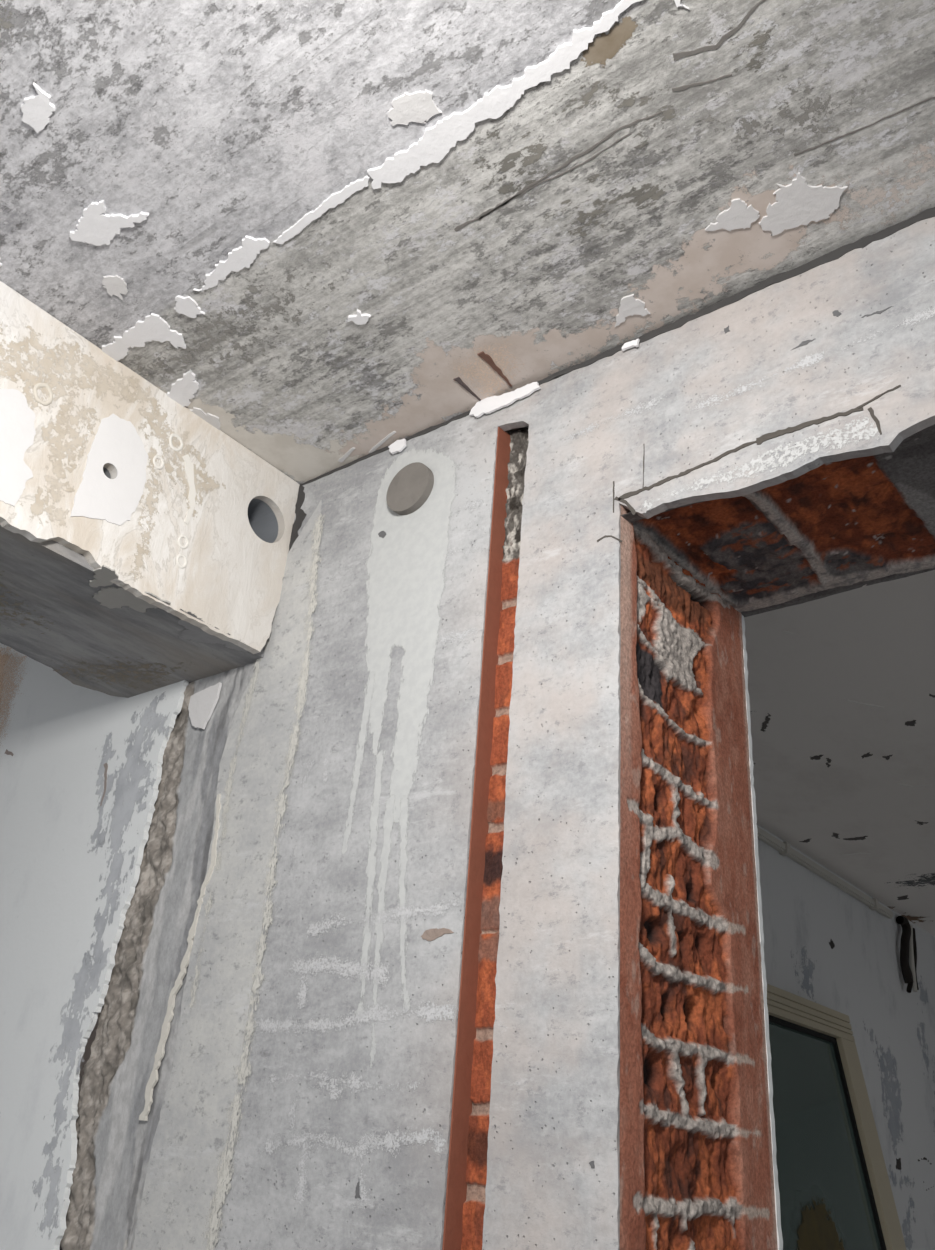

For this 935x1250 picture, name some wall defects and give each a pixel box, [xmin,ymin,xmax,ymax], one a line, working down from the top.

peeling [102,0,642,361]
crack [454,0,765,232]
crack [794,97,935,156]
water stain [338,431,396,463]
spalling [639,415,887,513]
spalling [32,565,258,1250]
water stain [202,513,331,1250]
water stain [263,447,484,1209]